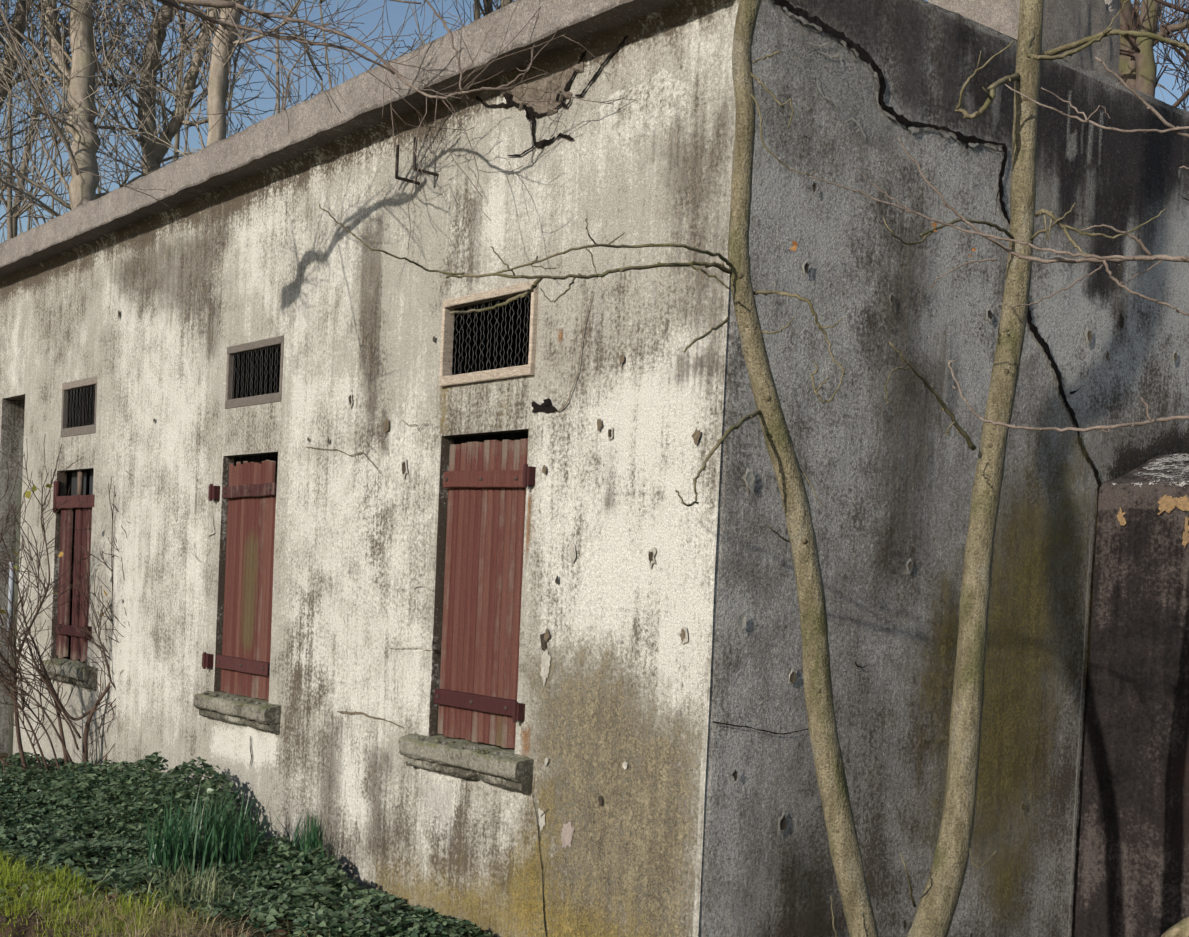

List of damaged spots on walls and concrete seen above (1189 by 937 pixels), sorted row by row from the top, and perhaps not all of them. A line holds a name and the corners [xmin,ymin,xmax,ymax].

crack [475,35,629,156]
crack [775,0,1010,225]
water stain [939,13,1016,150]
water stain [1036,60,1189,336]
water stain [360,222,385,449]
water stain [676,354,713,392]
peeling [1112,454,1189,548]
water stain [524,638,700,937]
crack [712,721,808,734]
crack [1027,303,1101,937]